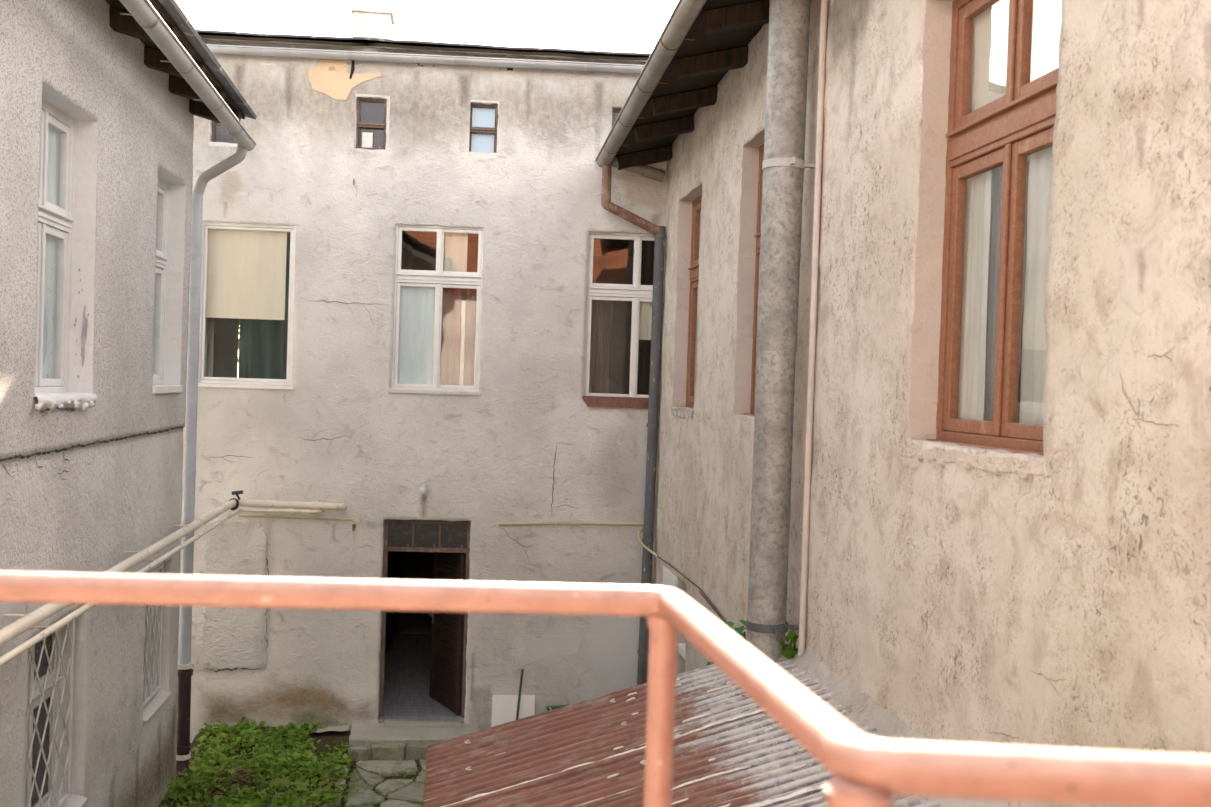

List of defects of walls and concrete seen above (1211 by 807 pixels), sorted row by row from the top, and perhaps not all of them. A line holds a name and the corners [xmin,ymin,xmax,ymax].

peeling [308,59,381,100]
crack [0,426,183,480]
crack [551,442,580,516]
water stain [81,665,384,807]